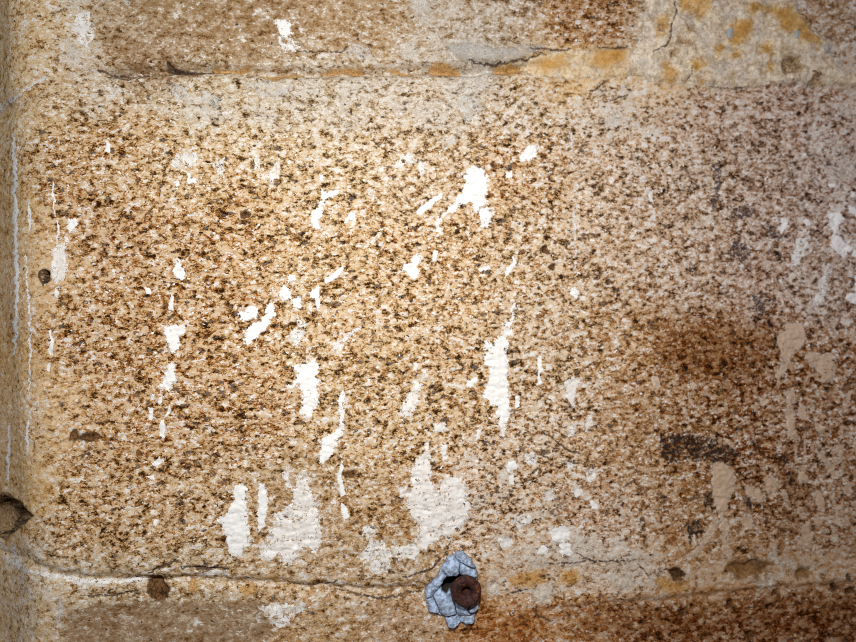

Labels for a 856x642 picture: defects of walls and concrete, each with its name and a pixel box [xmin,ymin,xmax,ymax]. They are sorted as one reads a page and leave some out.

crack [653,1,678,52]
spalling [0,490,34,540]
crack [293,541,451,599]
crack [545,552,650,579]